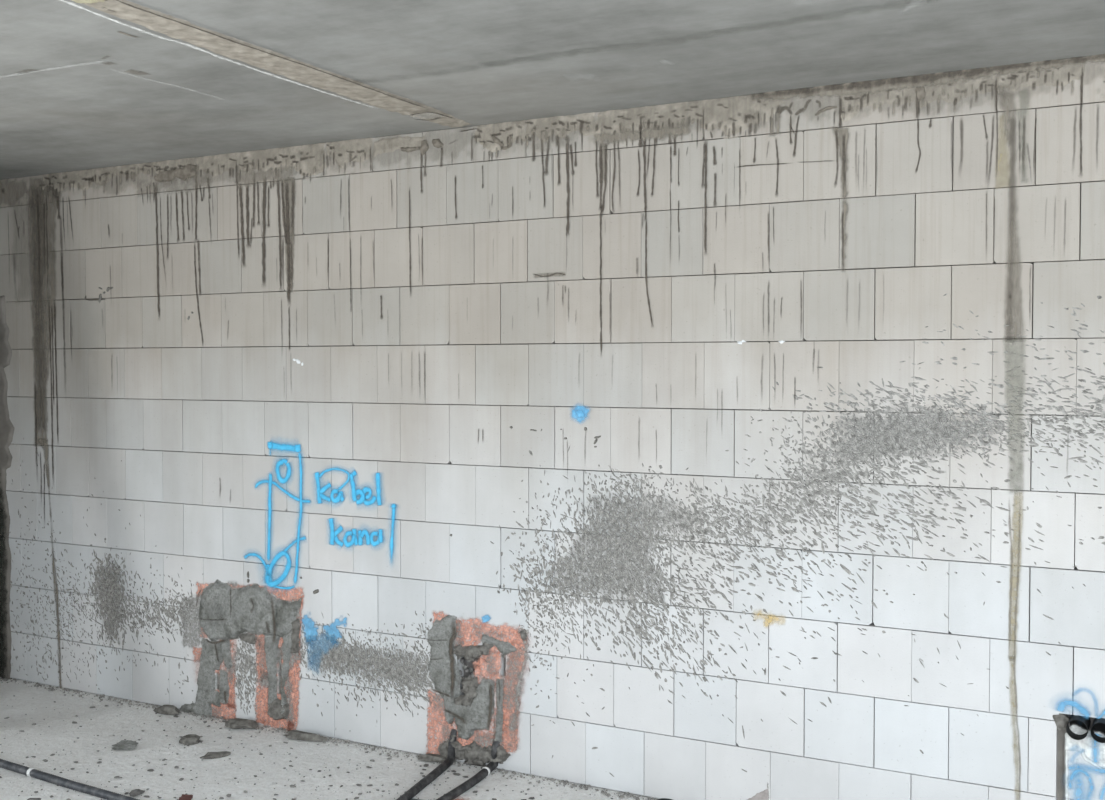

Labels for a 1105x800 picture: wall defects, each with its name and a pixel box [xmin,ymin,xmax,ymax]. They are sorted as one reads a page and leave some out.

water stain [0,153,316,516]
water stain [400,139,444,293]
water stain [474,68,1082,778]
water stain [53,554,62,688]